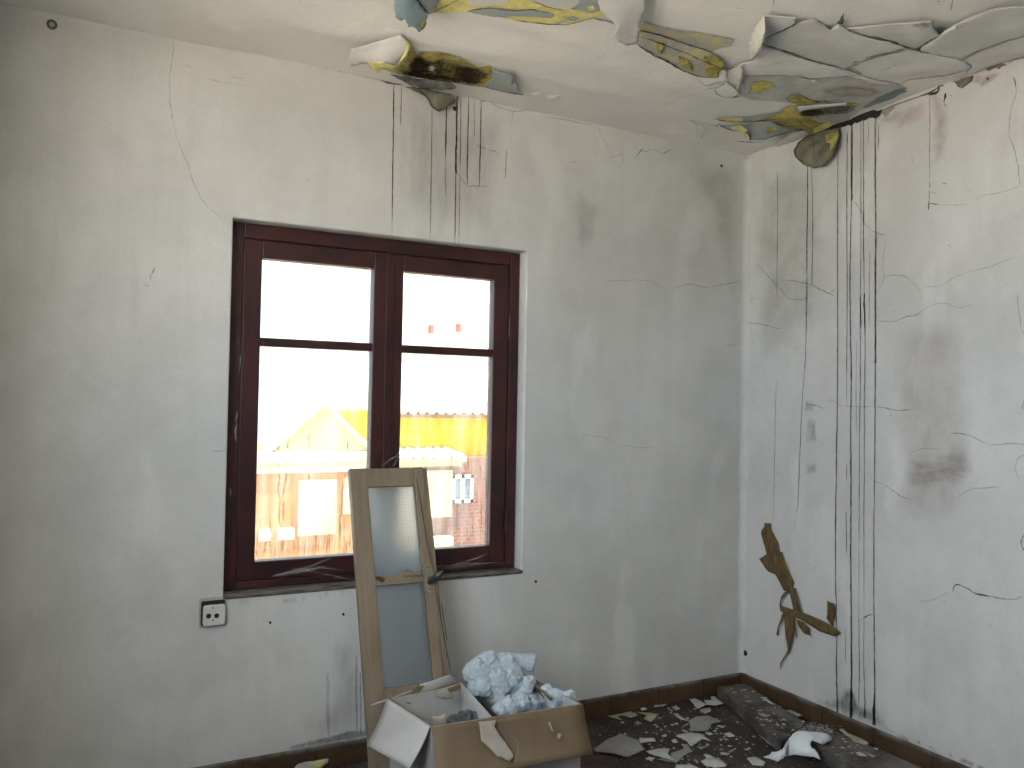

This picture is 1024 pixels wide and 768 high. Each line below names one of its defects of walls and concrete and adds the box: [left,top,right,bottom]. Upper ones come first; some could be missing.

peeling [348,0,456,112]
peeling [484,70,523,95]
peeling [598,0,647,46]
peeling [698,5,1024,98]
damp [392,86,401,216]
damp [445,96,482,230]
peeling [717,121,841,168]
damp [835,119,879,725]